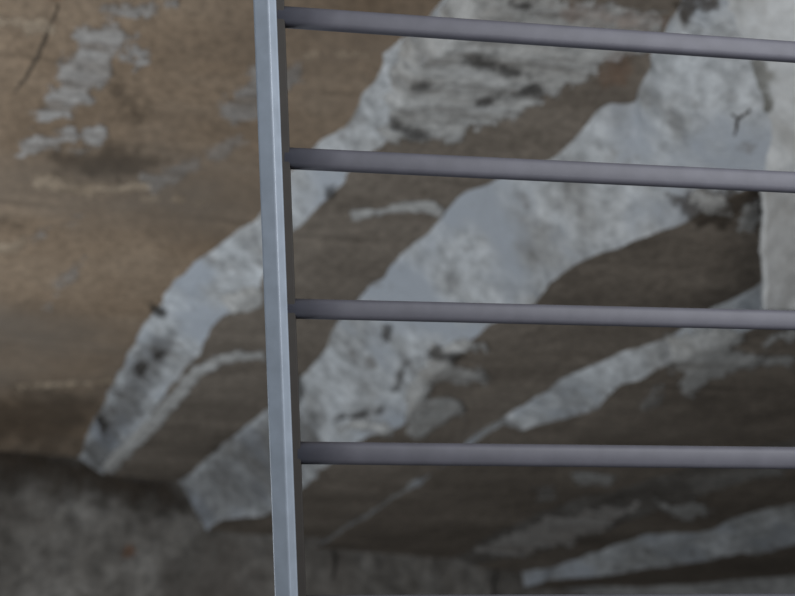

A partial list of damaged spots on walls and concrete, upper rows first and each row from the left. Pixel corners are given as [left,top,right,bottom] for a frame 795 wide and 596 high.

crack [14,4,59,93]
peeling [16,0,178,158]
peeling [377,36,640,144]
peeling [437,0,668,32]
crack [731,109,750,136]
peeling [350,200,444,222]
peeling [690,190,762,232]
peeling [219,286,264,314]
peeling [103,351,266,473]
peeling [392,339,490,439]
peeling [664,328,795,398]
peeling [474,501,641,558]